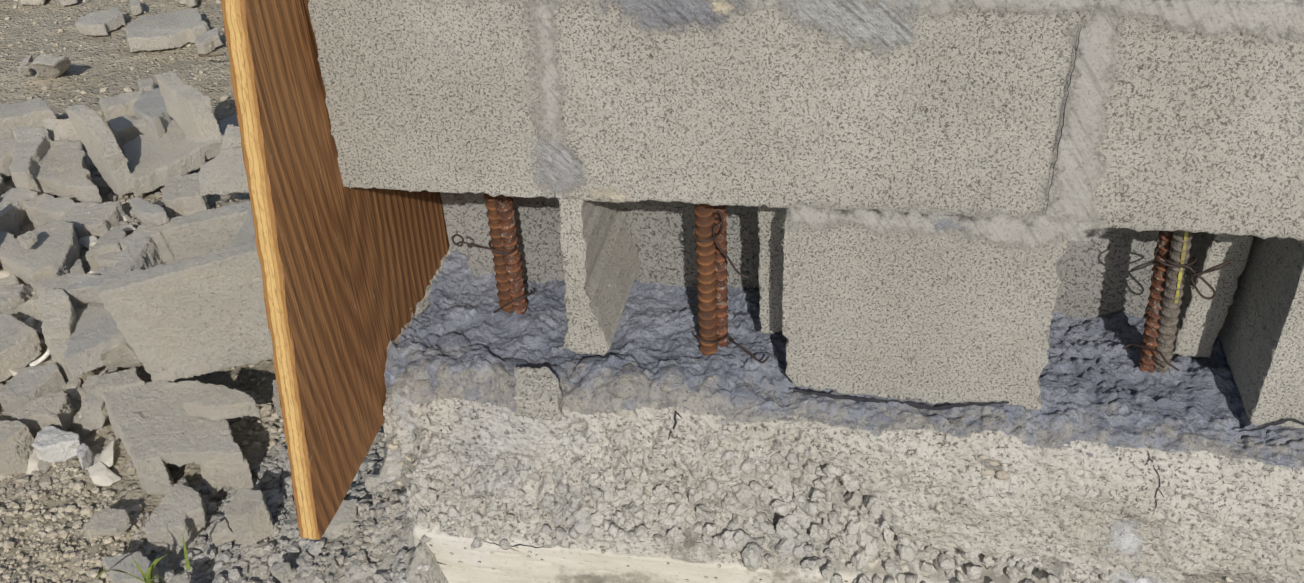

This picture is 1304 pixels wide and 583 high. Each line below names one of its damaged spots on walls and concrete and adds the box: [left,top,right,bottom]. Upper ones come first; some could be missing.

crack [1145,451,1164,514]